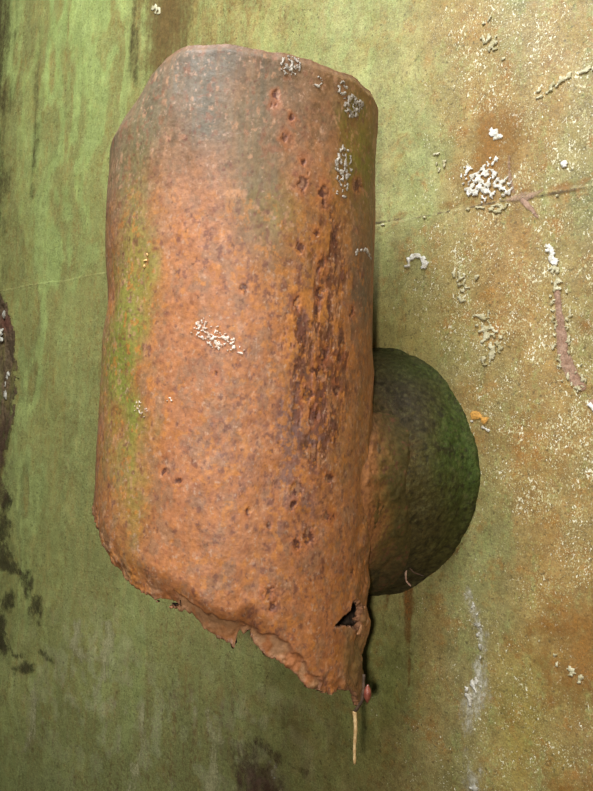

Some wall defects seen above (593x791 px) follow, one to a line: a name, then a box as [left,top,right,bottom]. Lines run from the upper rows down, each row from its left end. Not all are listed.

crack [375,156,575,226]
spalling [0,293,18,467]
peeling [0,477,42,624]
peeling [0,592,32,674]
leakage [464,591,486,728]